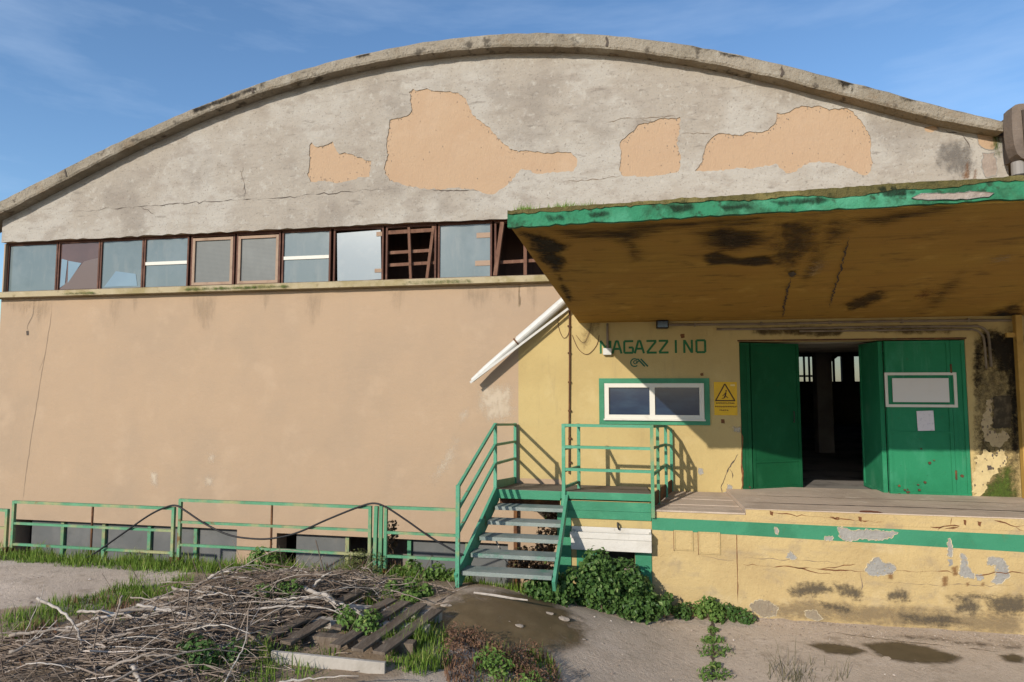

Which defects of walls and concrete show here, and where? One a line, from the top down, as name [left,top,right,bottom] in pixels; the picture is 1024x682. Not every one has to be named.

crack [78,172,380,214]
peeling [308,142,371,183]
peeling [384,89,577,194]
peeling [619,117,681,177]
peeling [695,106,873,175]
water stain [520,204,815,300]
crack [829,236,850,305]
water stain [847,291,883,309]
mould [973,331,1019,453]
crack [705,535,863,597]
peeling [946,538,1010,585]
water stain [781,602,1017,633]